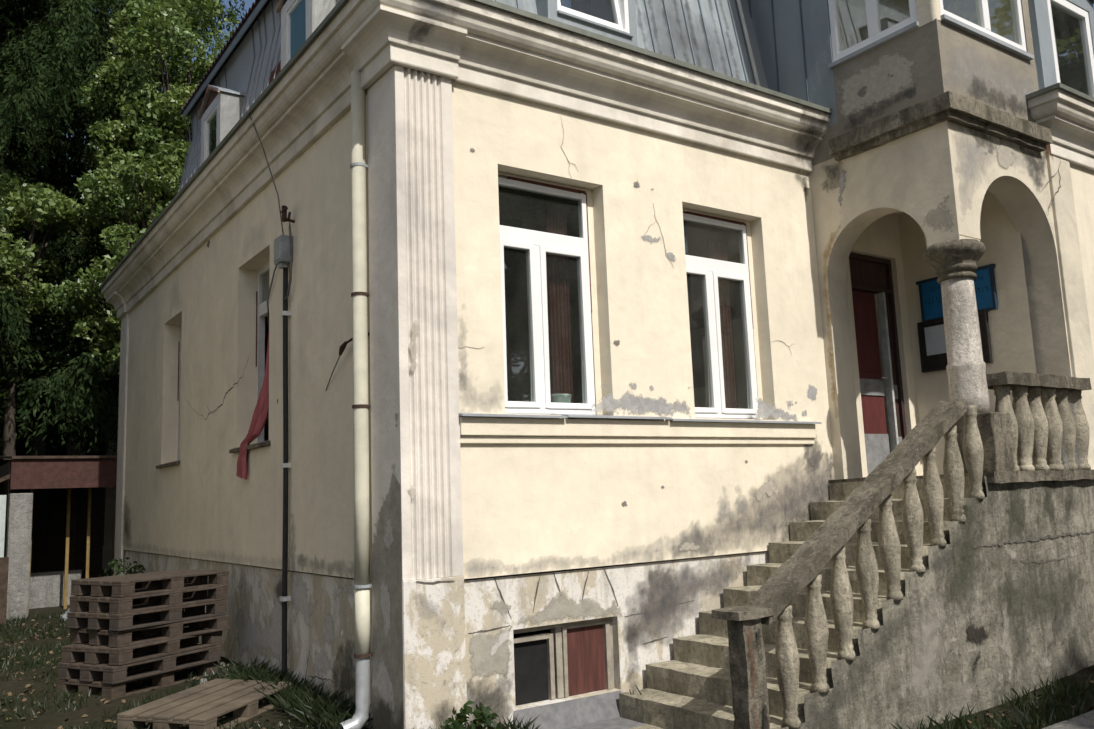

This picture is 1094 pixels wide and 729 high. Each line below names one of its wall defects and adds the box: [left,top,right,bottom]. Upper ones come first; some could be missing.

water stain [964,58,1031,112]
water stain [798,115,827,159]
spalling [409,321,419,372]
crack [183,358,249,420]
peeling [593,383,690,416]
water stain [672,442,835,551]
peeling [236,575,290,666]
peeling [372,471,415,729]
water stain [627,567,731,644]